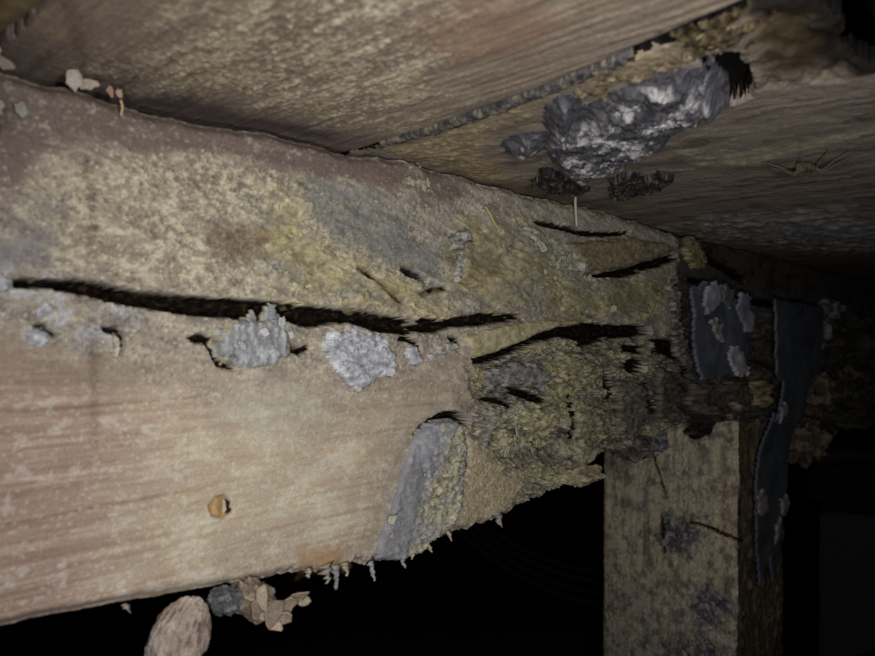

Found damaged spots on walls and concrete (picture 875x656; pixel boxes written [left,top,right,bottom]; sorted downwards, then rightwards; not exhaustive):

crack [534,221,626,238]
crack [586,235,689,278]
crack [12,267,519,369]
crack [471,323,689,413]
crack [566,394,575,439]